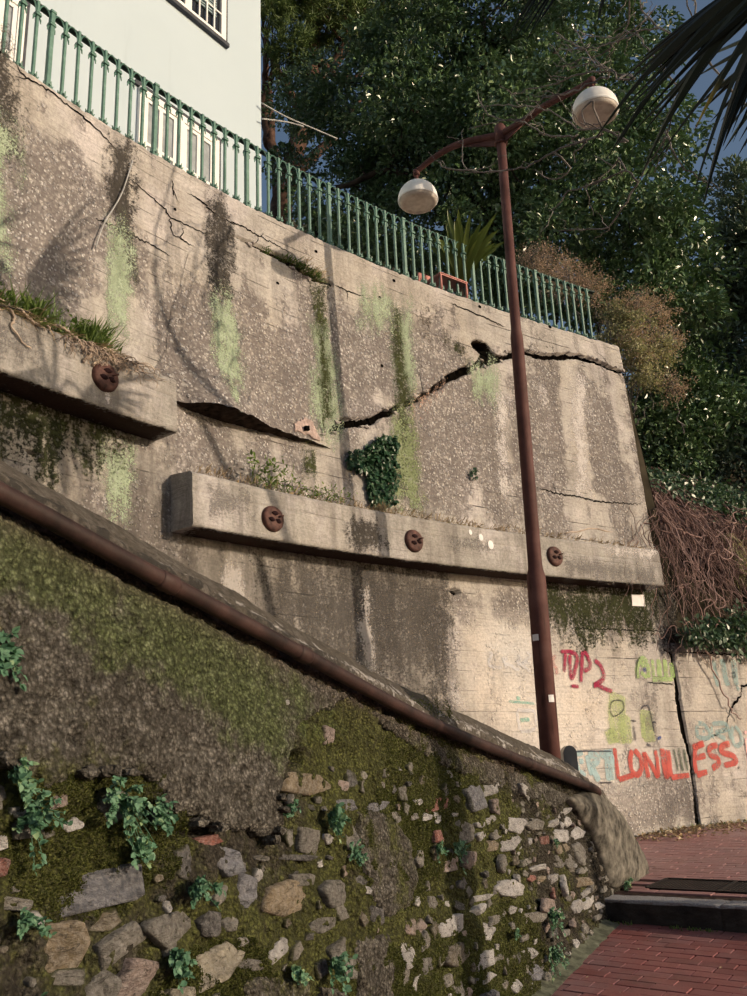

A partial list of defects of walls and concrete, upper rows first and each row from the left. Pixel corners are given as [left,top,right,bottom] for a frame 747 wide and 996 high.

water stain [0,23,29,187]
water stain [102,131,141,295]
water stain [203,190,237,306]
crack [94,179,370,300]
crack [320,304,625,440]
water stain [21,413,74,490]
water stain [574,612,597,661]
water stain [628,581,679,660]
crack [571,627,747,825]
flaking render [354,810,419,917]
flaking render [242,933,395,996]